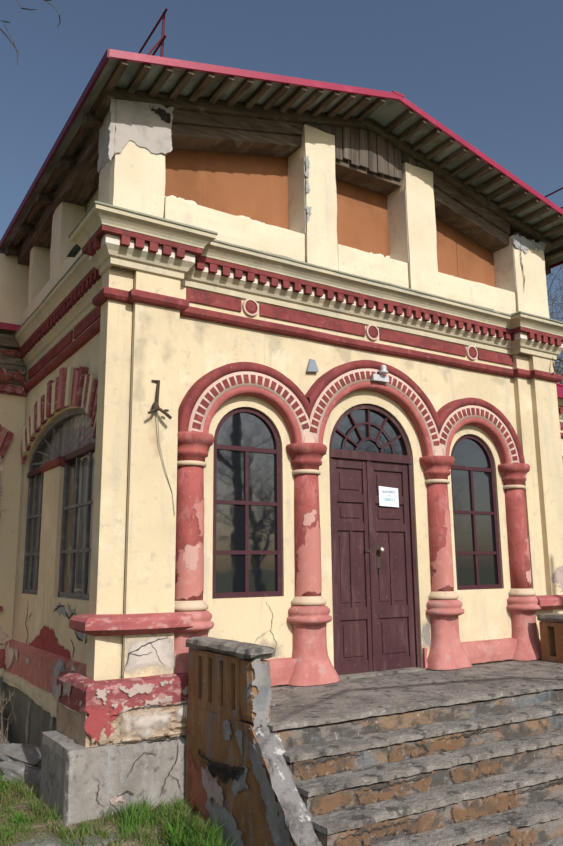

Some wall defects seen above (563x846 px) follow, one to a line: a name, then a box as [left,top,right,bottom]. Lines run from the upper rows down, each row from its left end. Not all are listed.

spalling [151,108,171,123]
peeling [175,500,205,600]
peeling [295,509,322,597]
peeling [430,509,454,592]
peeling [53,601,77,620]
peeling [4,641,30,669]
spalling [49,632,88,700]
spalling [83,680,188,745]
crack [115,703,187,716]
crack [116,735,186,796]
spalling [198,658,293,846]